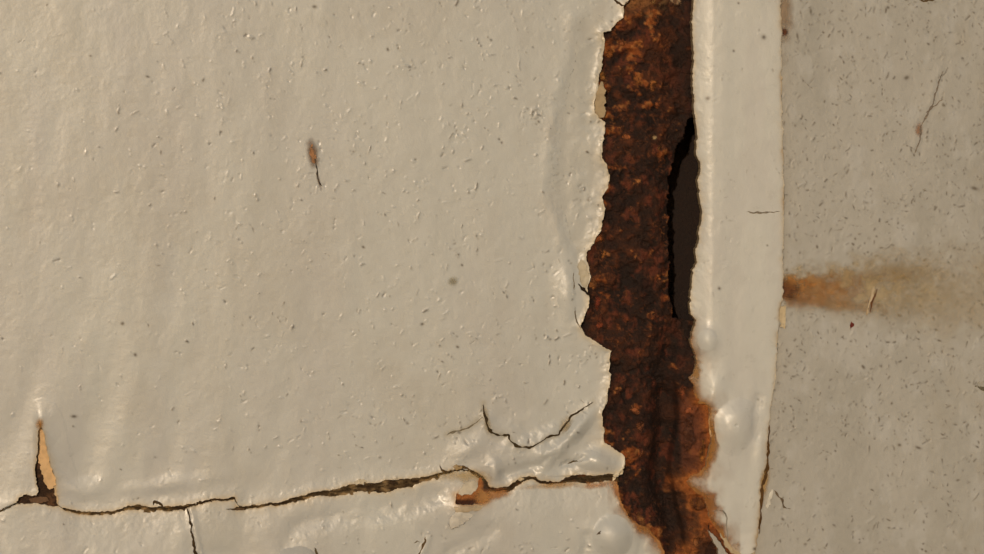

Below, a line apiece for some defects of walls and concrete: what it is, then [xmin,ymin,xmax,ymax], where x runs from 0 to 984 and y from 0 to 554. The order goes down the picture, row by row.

rust [308,143,322,186]
rust [581,0,733,554]
rust [779,264,928,329]
crack [447,402,593,449]
peeling [17,421,59,507]
crack [63,460,625,554]
peeling [449,477,489,530]